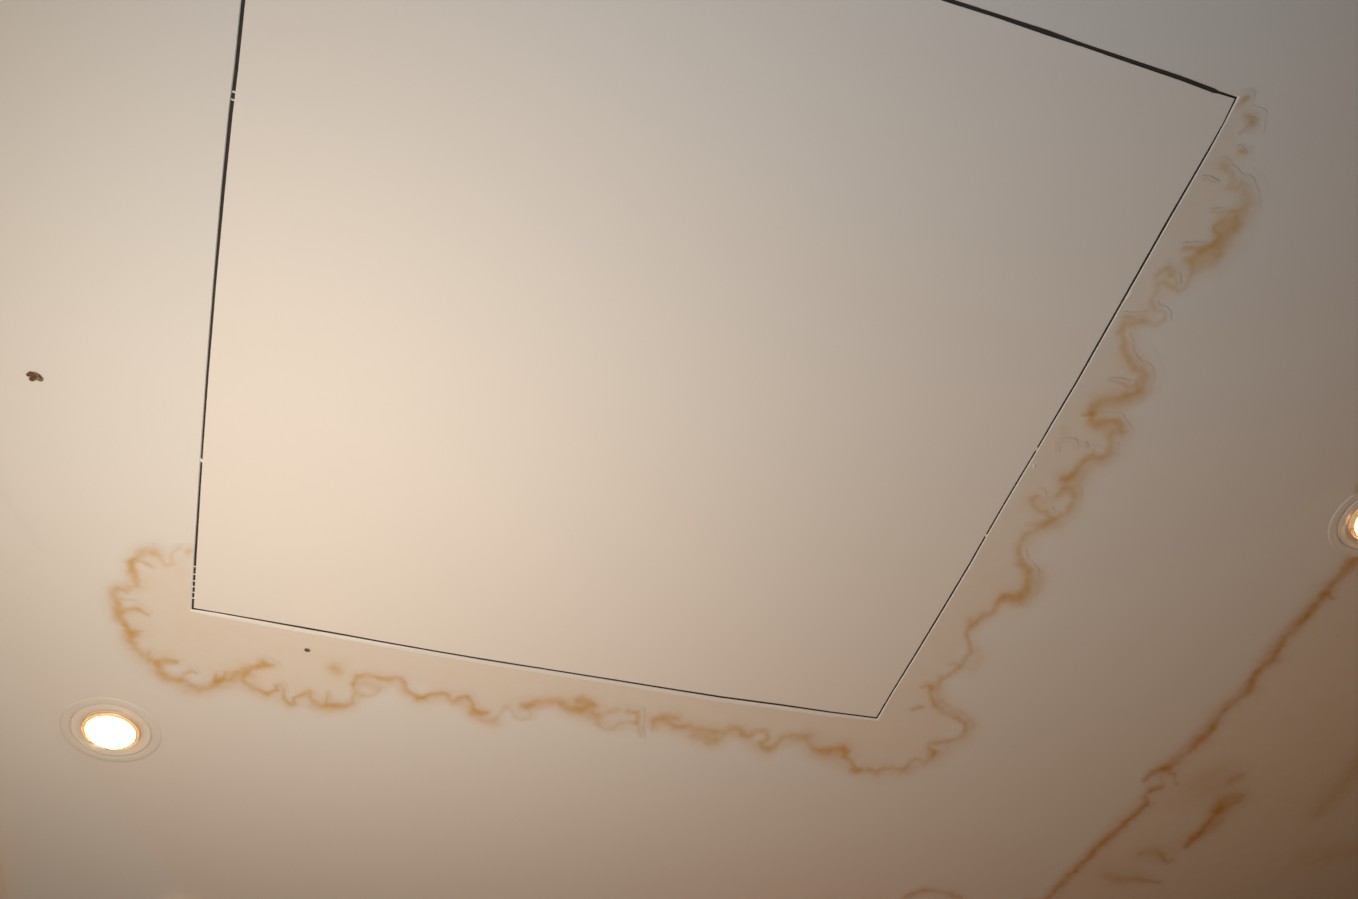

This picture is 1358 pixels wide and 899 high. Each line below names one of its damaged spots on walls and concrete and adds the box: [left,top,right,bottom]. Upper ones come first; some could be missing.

water stain [94,88,1270,788]
water stain [1019,554,1358,899]